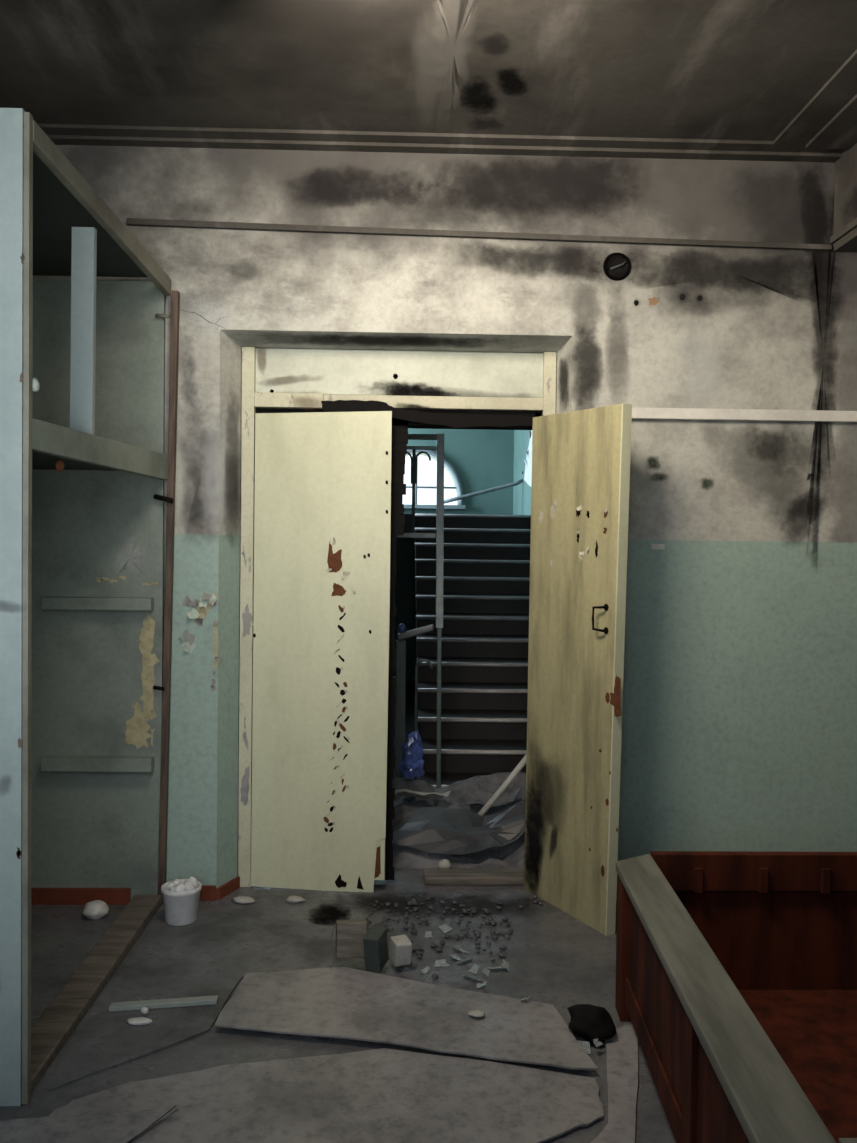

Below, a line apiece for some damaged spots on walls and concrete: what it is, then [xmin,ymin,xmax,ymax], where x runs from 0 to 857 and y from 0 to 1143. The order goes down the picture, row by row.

damp [802,174,824,262]
damp [383,383,450,411]
damp [790,496,818,529]
peeling [178,591,222,691]